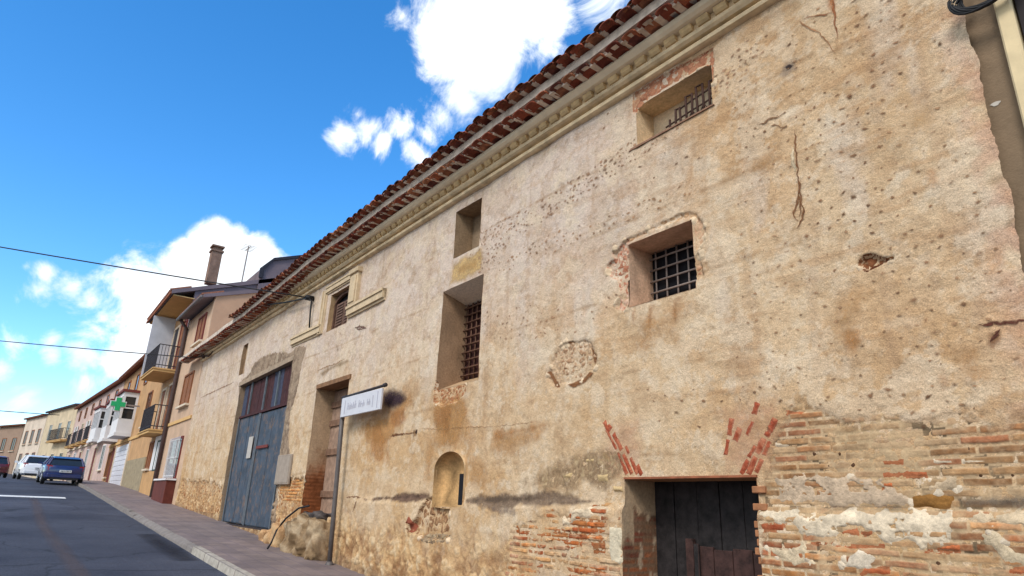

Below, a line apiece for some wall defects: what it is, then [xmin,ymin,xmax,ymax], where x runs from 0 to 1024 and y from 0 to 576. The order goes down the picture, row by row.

crack [800,1,838,52]
flaking render [796,52,902,179]
crack [761,112,805,228]
flaking render [842,178,894,282]
flaking render [484,305,598,388]
crack [979,319,1024,342]
damp [373,493,429,502]
flaking render [405,494,451,544]
damp [467,492,578,512]
peeling [505,420,643,576]
flaking render [723,366,1024,576]